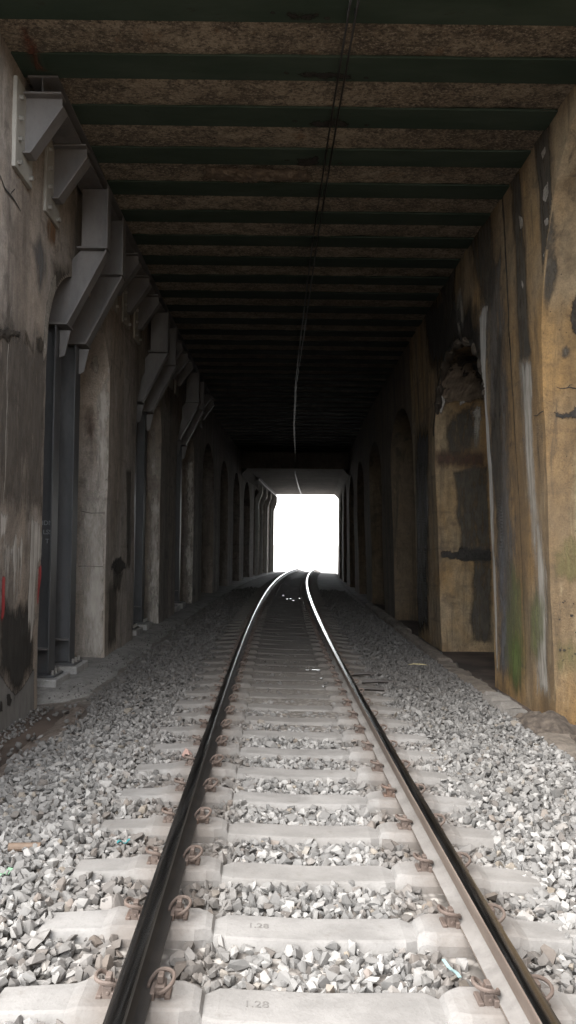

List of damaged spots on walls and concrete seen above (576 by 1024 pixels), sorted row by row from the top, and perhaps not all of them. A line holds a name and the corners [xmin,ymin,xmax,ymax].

spalling [433,333,485,436]
damp [425,216,516,668]
damp [0,604,33,690]